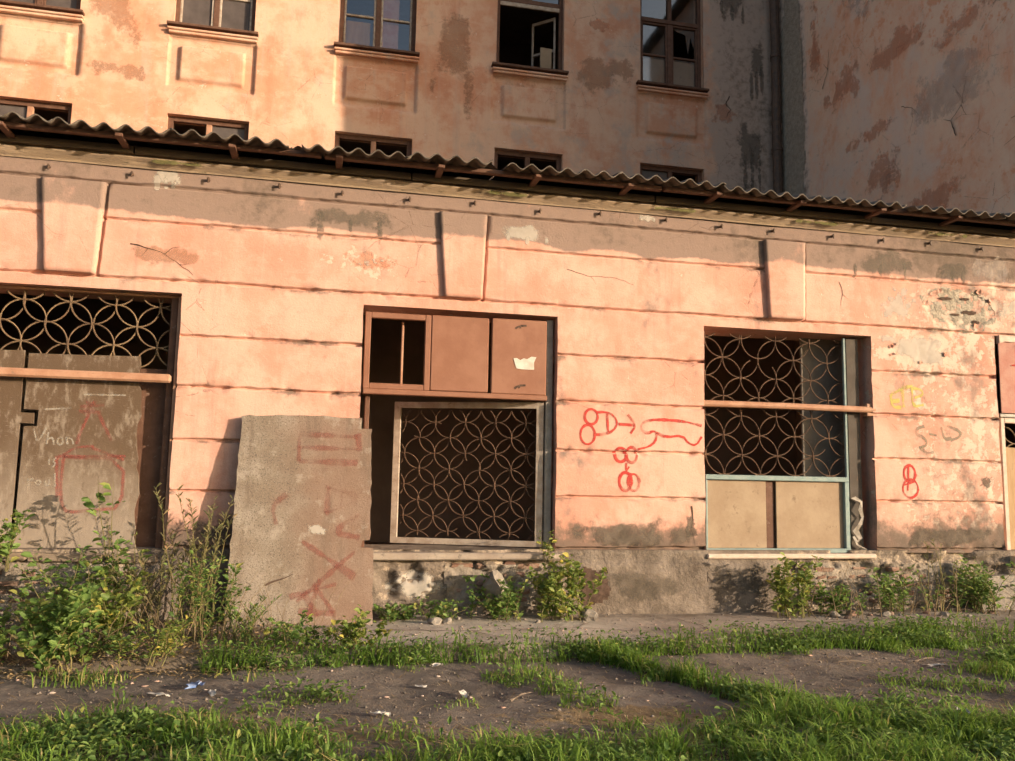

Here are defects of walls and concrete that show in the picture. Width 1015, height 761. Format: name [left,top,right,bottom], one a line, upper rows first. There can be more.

leakage [749,44,764,99]
leakage [738,123,762,191]
crack [130,243,193,275]
spalling [883,286,1015,334]
leakage [572,516,697,550]
flaking render [385,561,567,607]